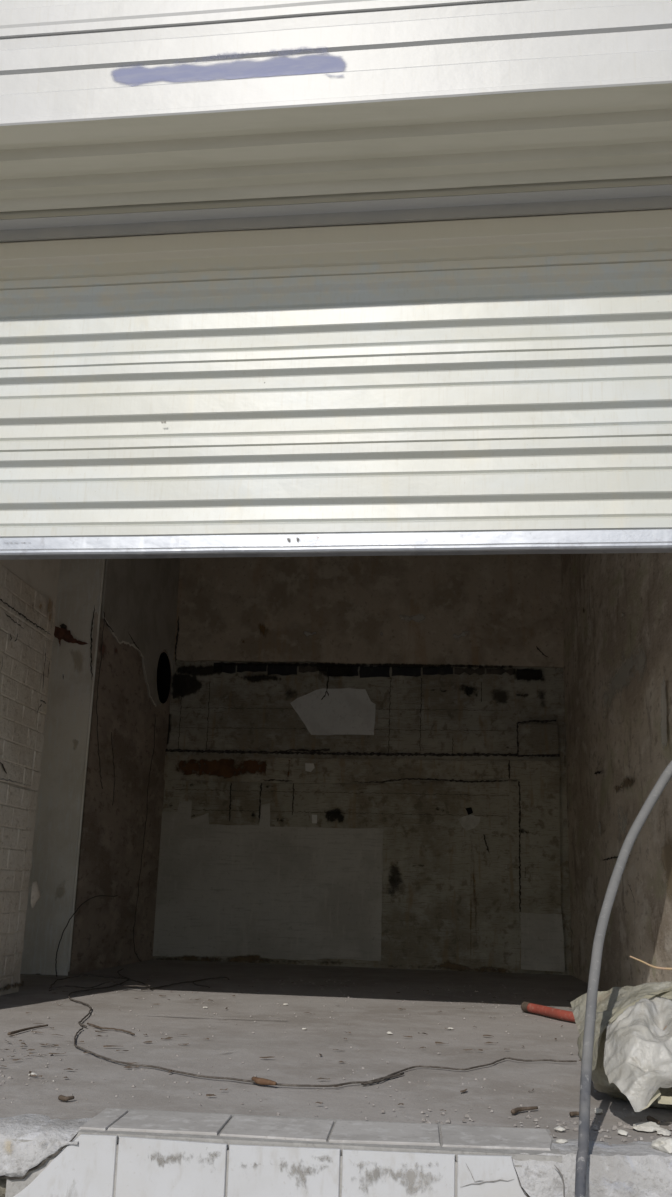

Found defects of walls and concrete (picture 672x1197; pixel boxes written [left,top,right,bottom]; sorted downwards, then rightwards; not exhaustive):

leakage [359,1164,432,1192]
crack [462,1160,528,1197]